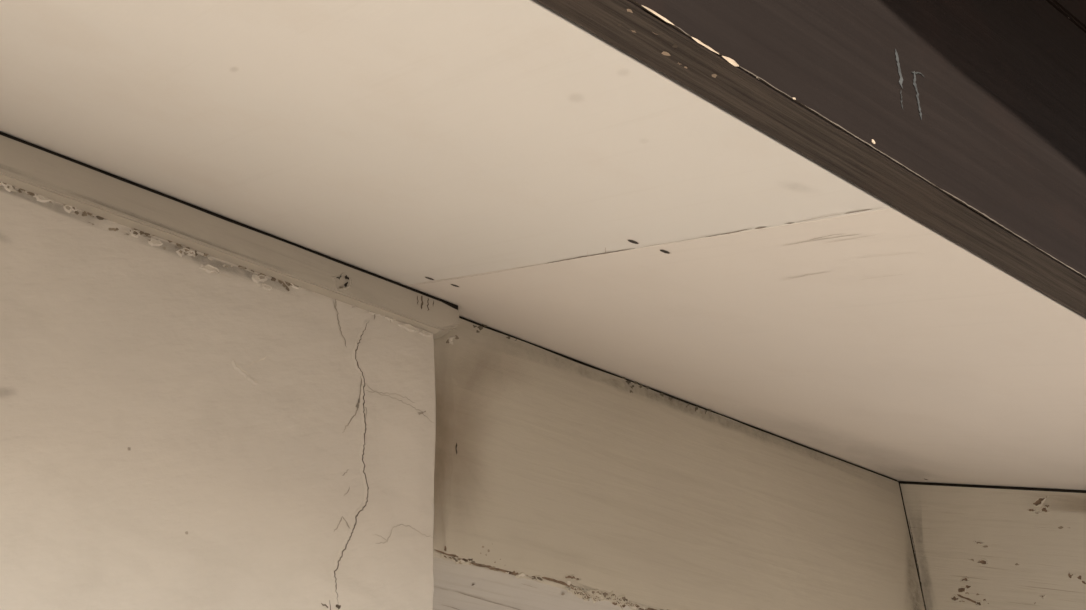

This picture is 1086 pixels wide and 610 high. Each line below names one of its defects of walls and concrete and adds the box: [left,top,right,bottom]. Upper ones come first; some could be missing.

peeling [0,182,312,292]
crack [321,299,429,610]
peeling [1027,495,1050,515]
peeling [436,543,668,610]
peeling [950,576,989,607]